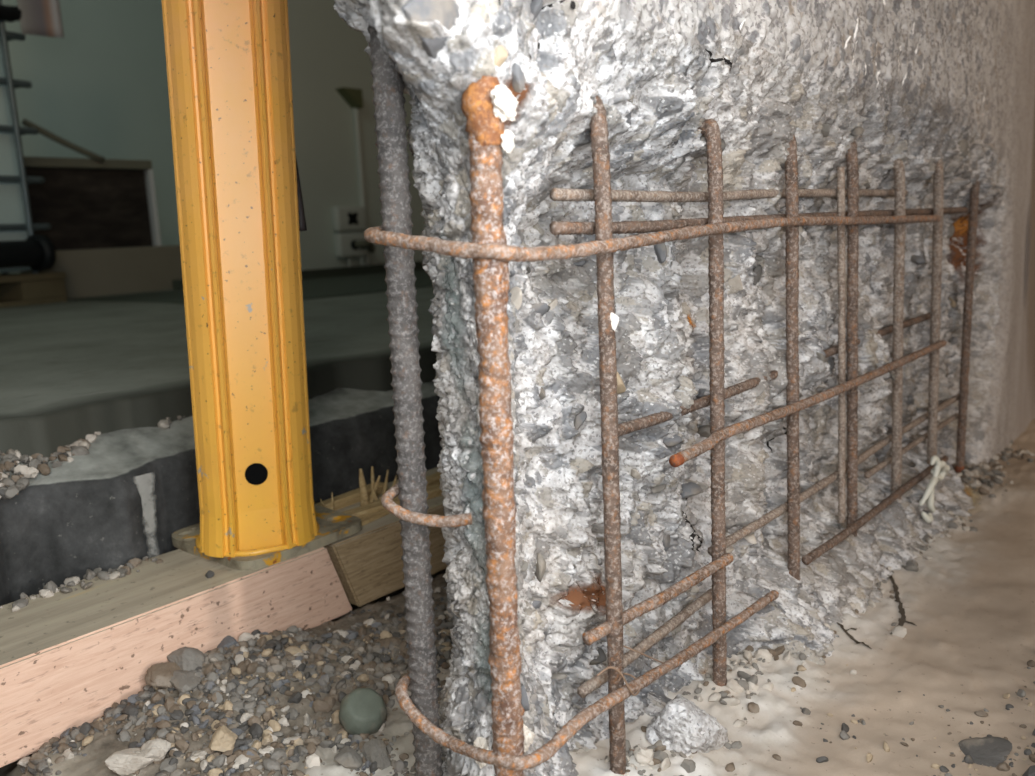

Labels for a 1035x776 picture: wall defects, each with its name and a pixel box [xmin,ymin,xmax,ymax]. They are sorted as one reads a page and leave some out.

rust [461,76,530,146]
rust [947,201,991,277]
spalling [333,0,1007,776]
rust [560,577,606,614]